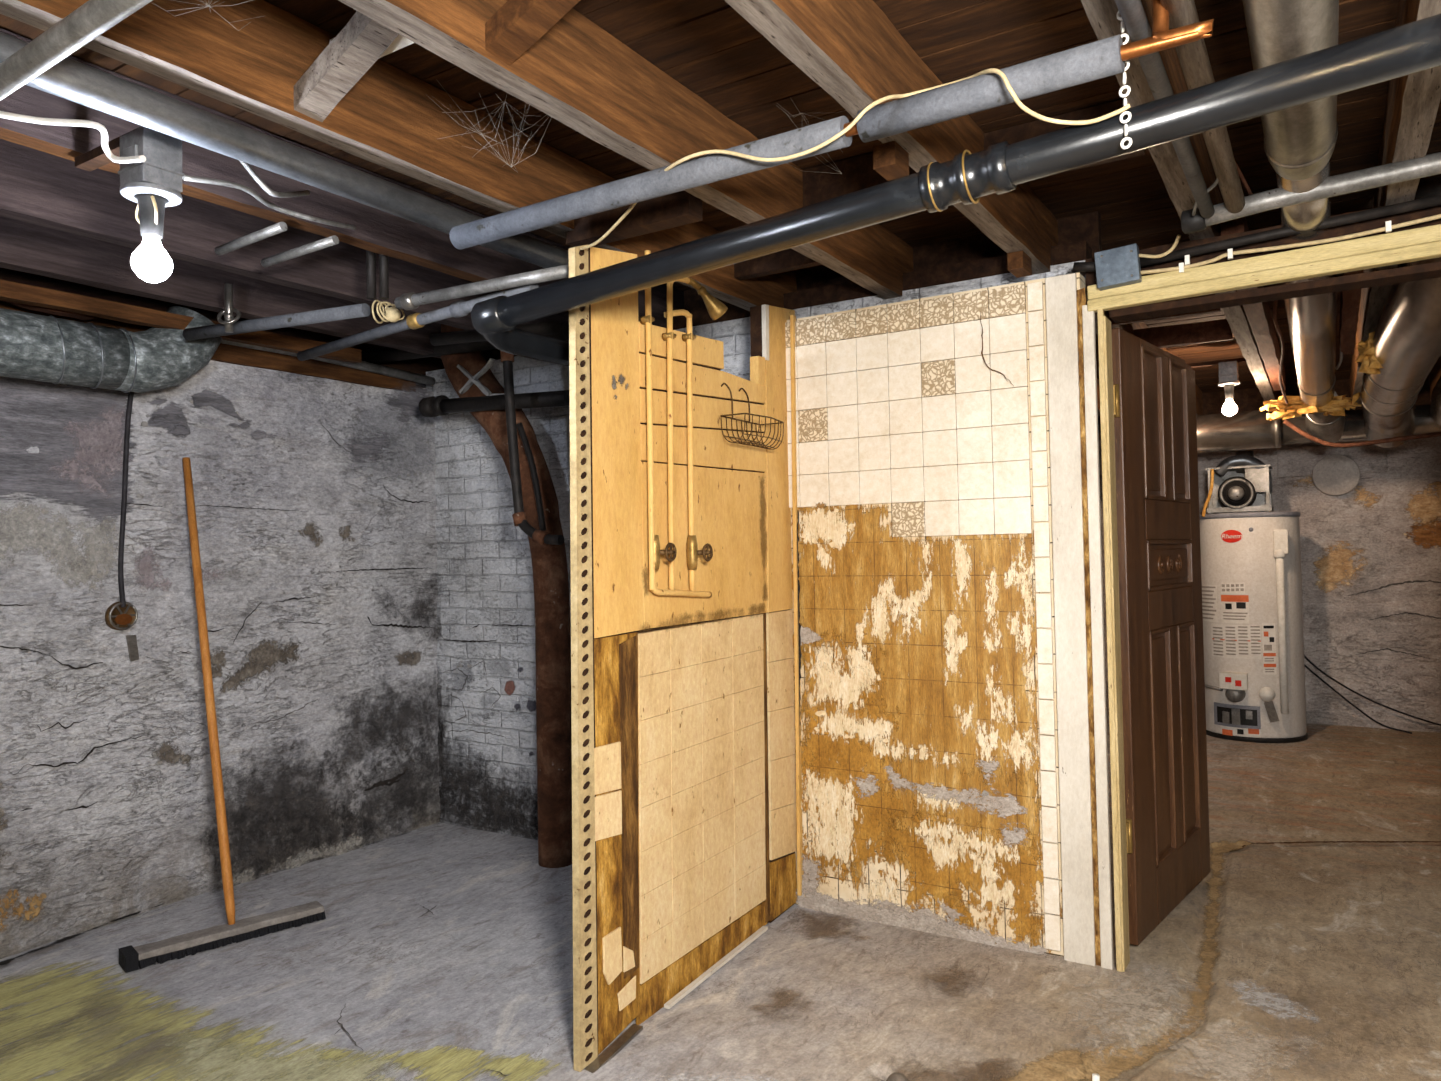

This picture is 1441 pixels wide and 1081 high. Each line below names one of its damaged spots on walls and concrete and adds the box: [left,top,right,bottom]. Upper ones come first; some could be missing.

peeling [799,507,856,575]
spalling [1313,541,1368,593]
spalling [1404,481,1441,549]
damp [384,580,442,639]
crack [0,646,103,669]
crack [13,719,141,775]
peeling [800,539,1039,933]
crack [22,801,98,811]
damp [201,680,538,886]
crack [1242,840,1441,848]
rust [0,889,47,931]